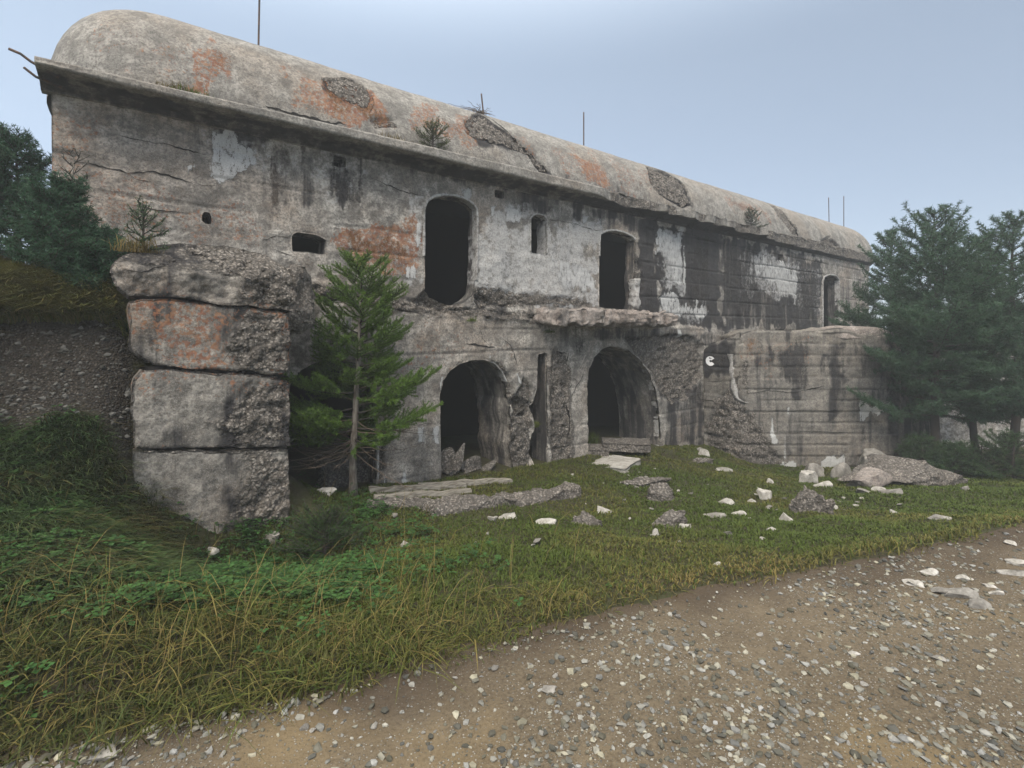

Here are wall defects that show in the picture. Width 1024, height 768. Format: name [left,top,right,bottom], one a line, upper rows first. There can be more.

crack [265,105,346,125]
spalling [327,79,370,107]
crack [114,134,198,153]
peeling [210,130,257,184]
damp [270,145,288,206]
damp [330,153,363,209]
spalling [648,169,692,207]
rust [338,228,407,267]
damp [721,235,765,315]
spalling [627,336,703,405]
damp [760,341,808,389]
spalling [705,360,786,465]